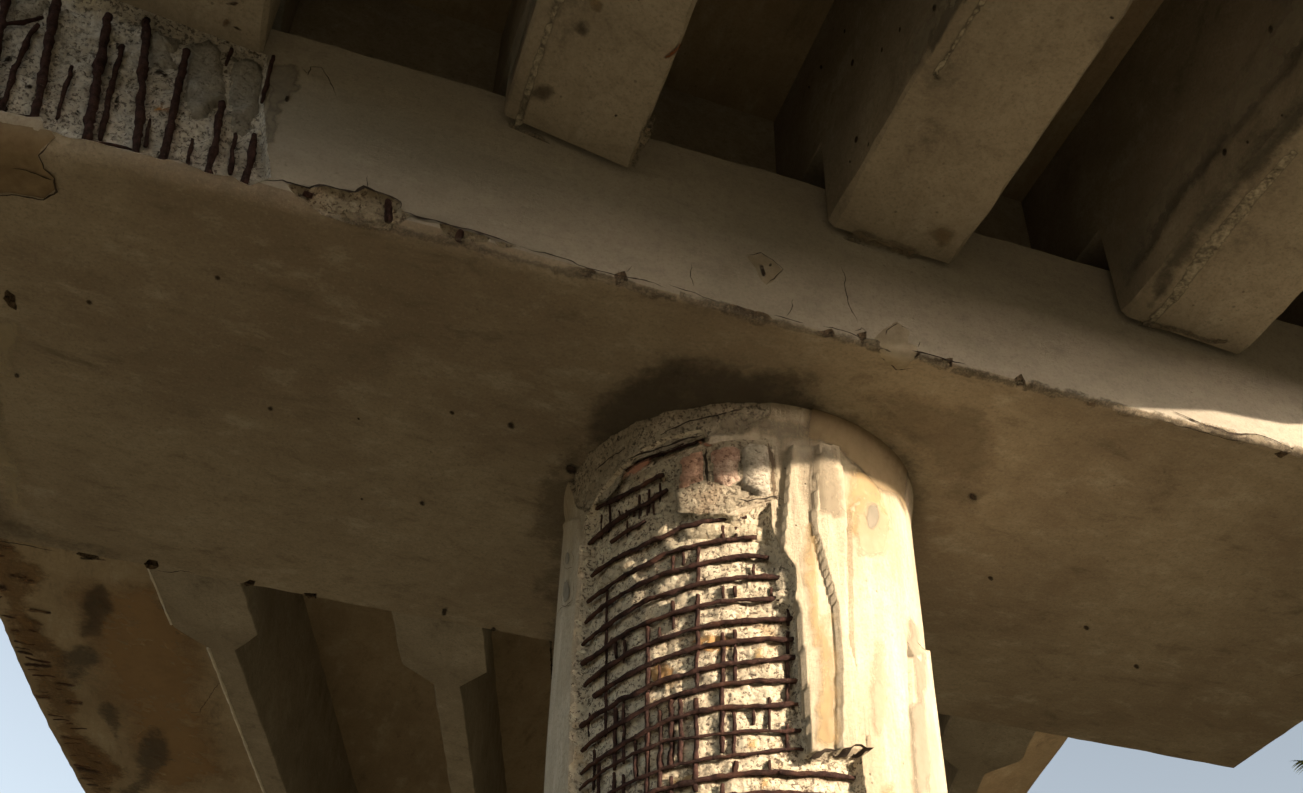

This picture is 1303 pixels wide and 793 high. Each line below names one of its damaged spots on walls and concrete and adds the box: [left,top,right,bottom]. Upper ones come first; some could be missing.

spalling [0,0,891,352]
damp [598,371,813,440]
spalling [914,352,1303,458]
damp [850,471,889,554]
spalling [568,402,873,793]
damp [75,568,266,793]
rust [818,632,836,744]